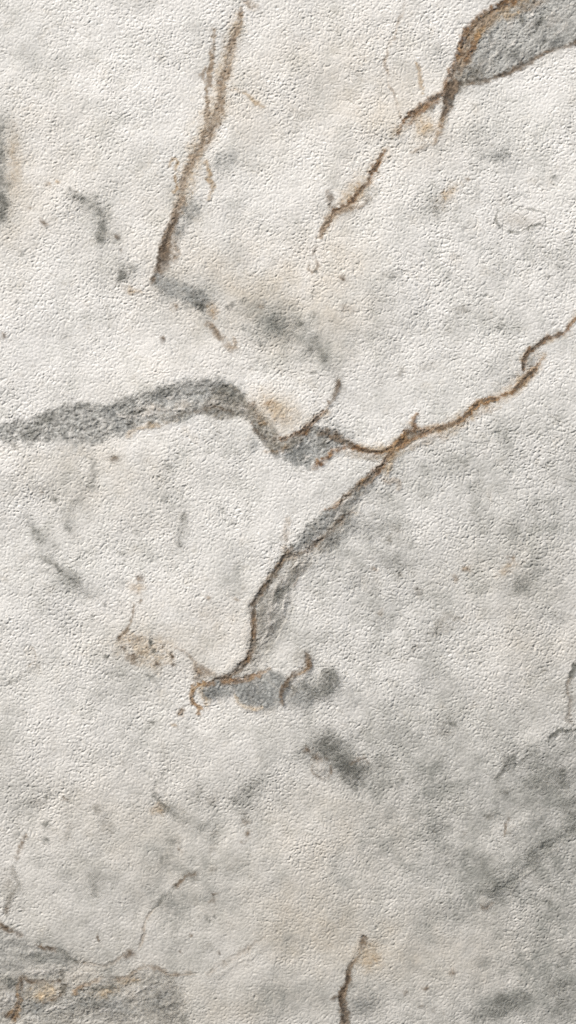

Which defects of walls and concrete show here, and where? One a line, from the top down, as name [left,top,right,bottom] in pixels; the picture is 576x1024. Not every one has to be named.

crack [320,63,459,238]
crack [178,317,576,715]
crack [549,729,576,739]
crack [333,936,376,1024]